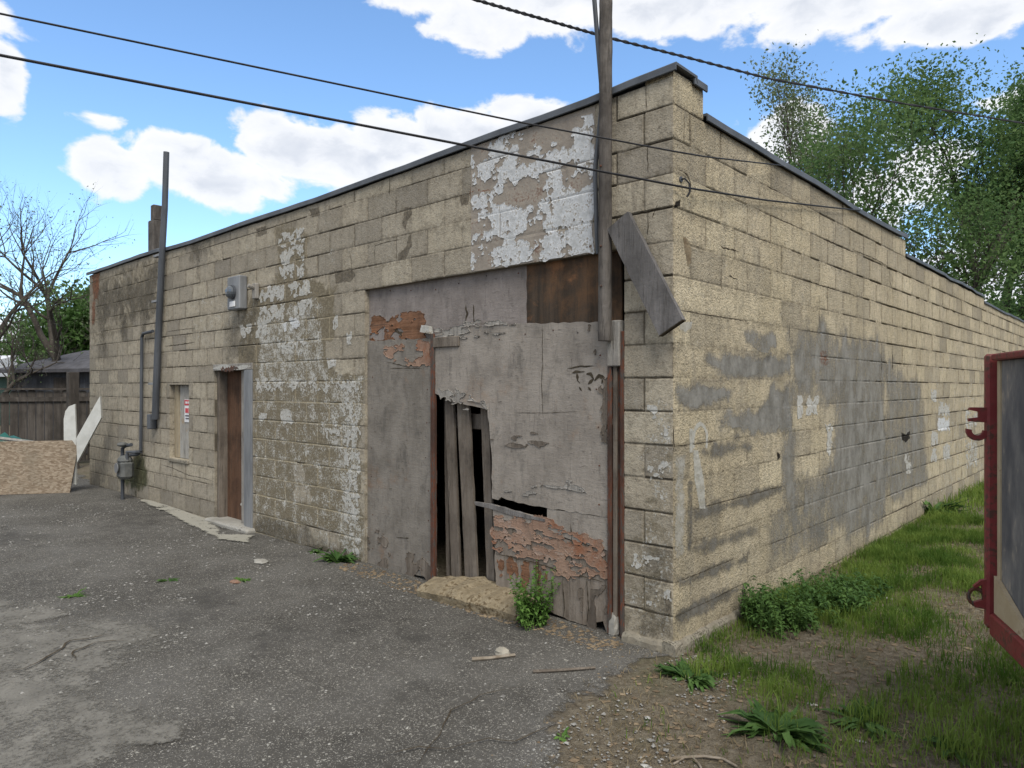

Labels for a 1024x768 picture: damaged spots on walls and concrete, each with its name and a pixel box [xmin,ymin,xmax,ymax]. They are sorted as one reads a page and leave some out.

peeling [460,107,595,272]
peeling [240,227,313,354]
peeling [333,315,352,345]
spalling [334,268,355,283]
peeling [255,357,361,554]
leakage [675,429,705,553]